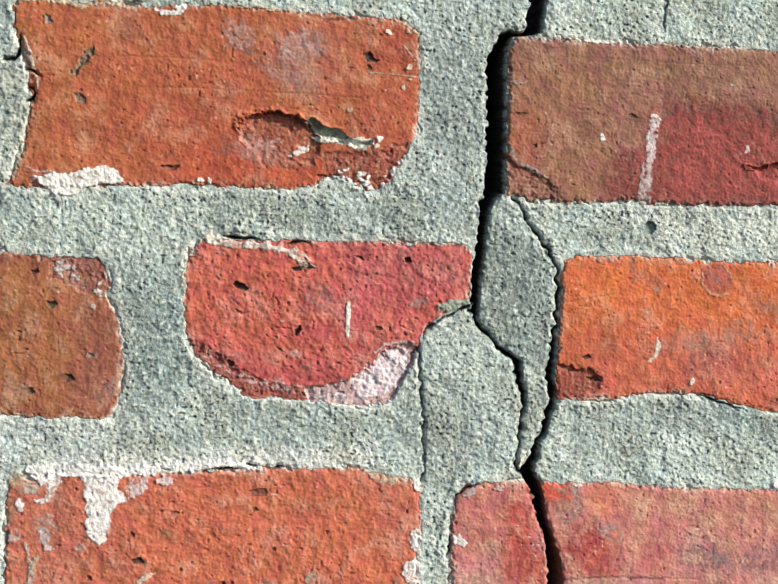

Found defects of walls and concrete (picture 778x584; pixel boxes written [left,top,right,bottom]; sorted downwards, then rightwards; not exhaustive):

crack [661,0,669,33]
spalling [237,112,409,189]
crack [415,0,563,584]
spalling [188,339,419,406]